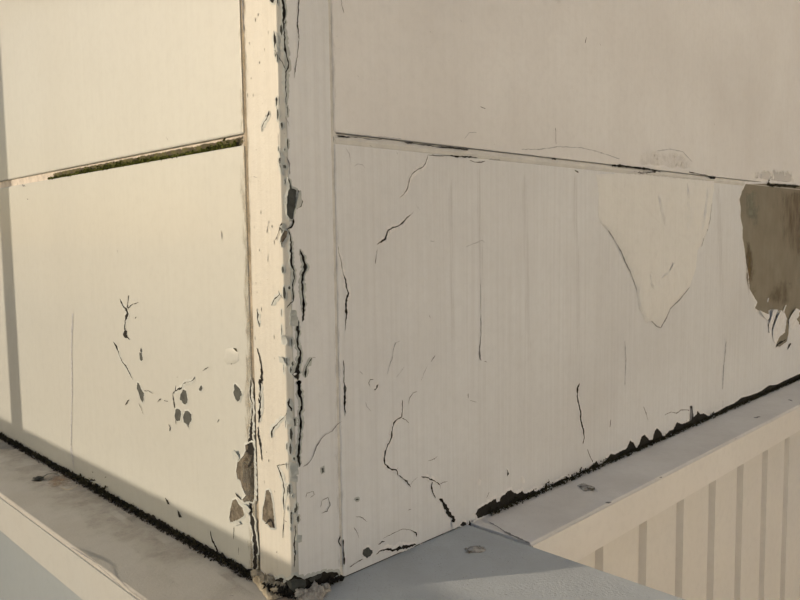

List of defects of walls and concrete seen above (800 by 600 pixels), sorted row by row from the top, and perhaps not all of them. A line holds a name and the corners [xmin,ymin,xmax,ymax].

crack [261,0,299,132]
peeling [738,180,800,349]
crack [113,295,138,380]
peeling [278,285,298,375]
peeling [174,387,193,429]
peeling [233,382,244,403]
spalling [229,440,277,530]
peeling [284,409,302,555]
crack [246,231,361,566]
crack [381,356,455,522]
crack [209,500,259,570]
crack [376,529,417,555]